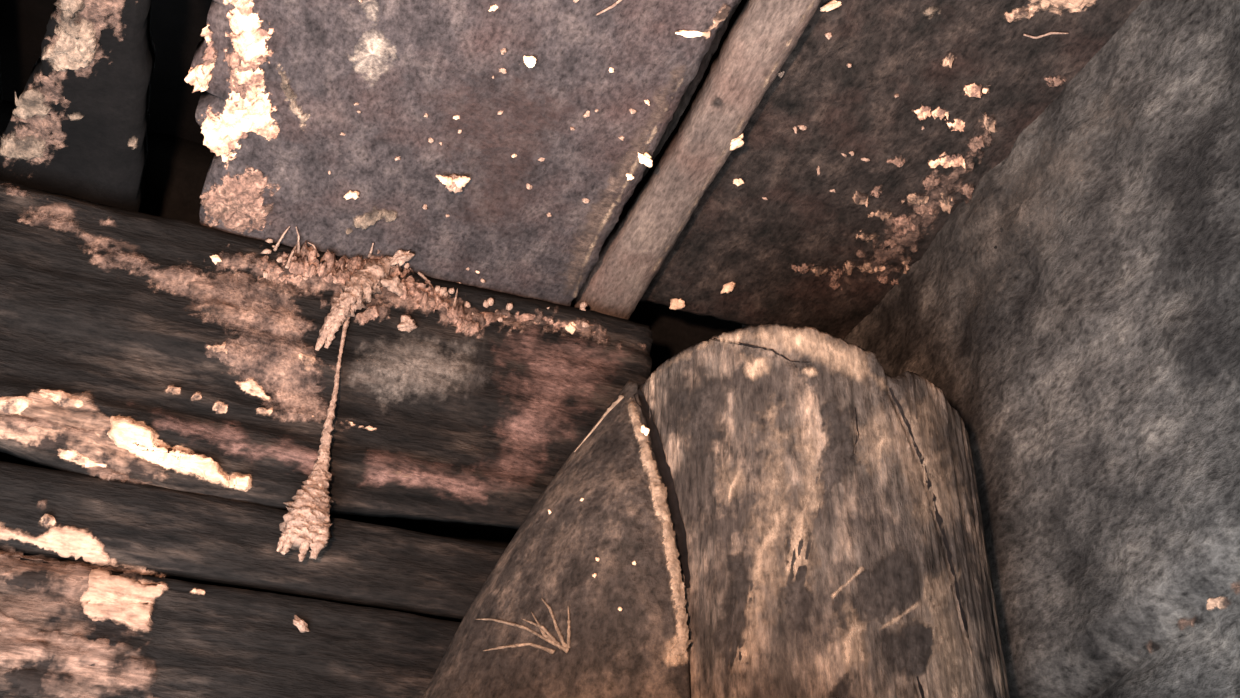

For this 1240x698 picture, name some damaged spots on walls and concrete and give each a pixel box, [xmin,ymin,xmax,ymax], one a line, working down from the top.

peeling [0,500,167,698]
peeling [0,389,252,491]
crack [574,389,692,659]